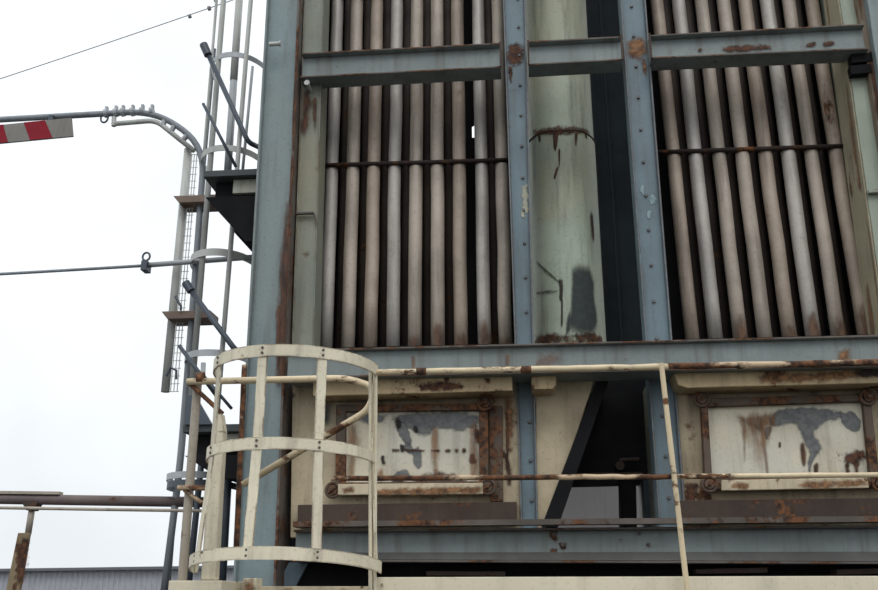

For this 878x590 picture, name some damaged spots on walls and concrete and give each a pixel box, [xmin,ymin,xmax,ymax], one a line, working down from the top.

corrosion [506,44,524,82]
corrosion [723,43,771,52]
corrosion [533,125,589,179]
corrosion [276,55,317,344]
corrosion [534,332,602,344]
corrosion [276,356,285,385]
corrosion [759,350,862,382]
corrosion [377,427,481,495]
peeling [394,412,479,475]
corrosion [742,415,774,470]
peeling [765,407,860,472]
corrosion [12,539,30,590]